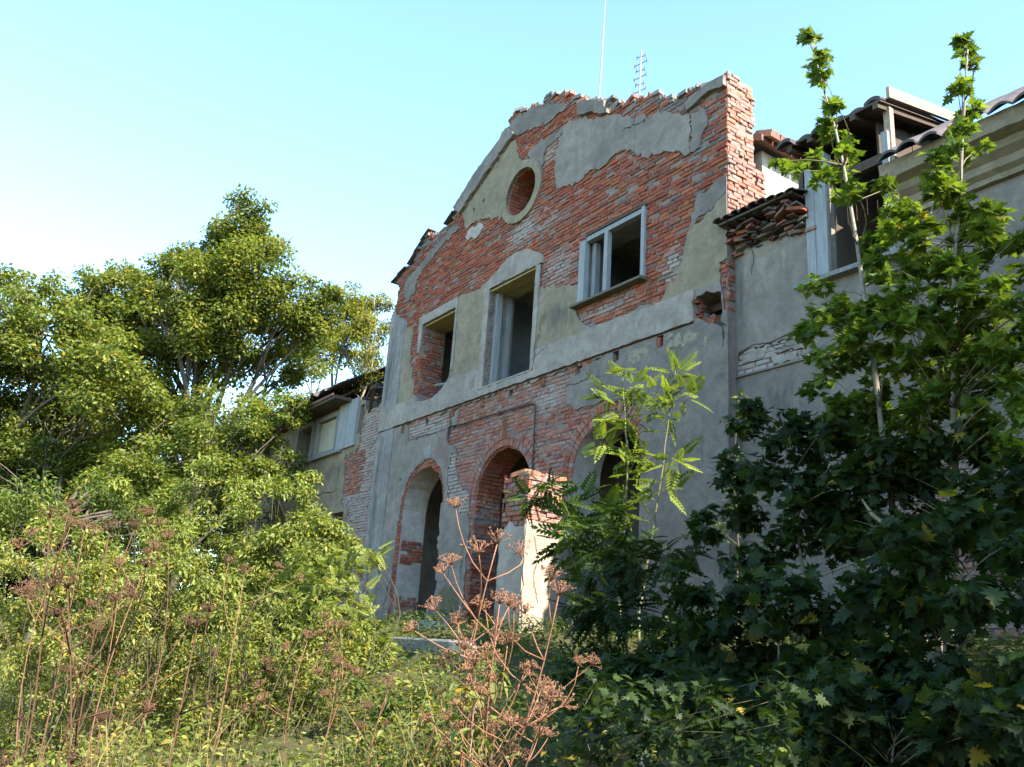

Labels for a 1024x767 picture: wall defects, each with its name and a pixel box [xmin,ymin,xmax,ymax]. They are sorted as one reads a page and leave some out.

spalling [388,71,766,624]
spalling [738,339,810,375]
spalling [338,403,381,618]